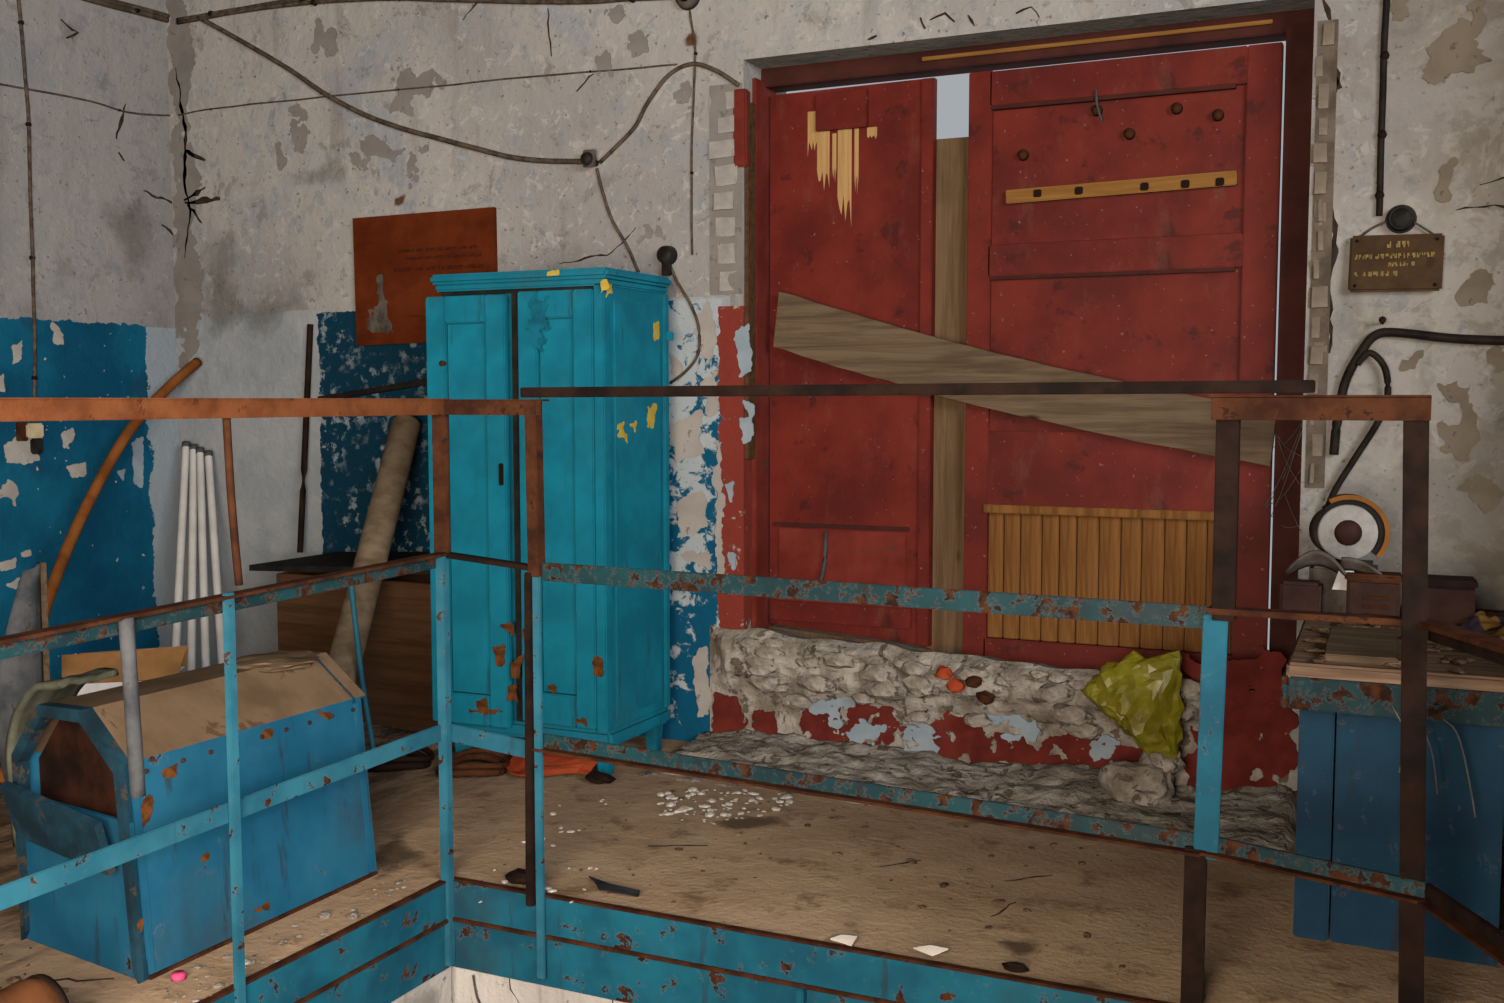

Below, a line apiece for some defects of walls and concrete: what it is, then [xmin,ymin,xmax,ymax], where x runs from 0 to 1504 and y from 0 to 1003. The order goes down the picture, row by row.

flaking render [1419,0,1492,85]
crack [116,73,220,256]
peeling [0,340,23,392]
flaking render [669,80,755,574]
flaking render [1455,269,1494,307]
peeling [0,437,40,506]
peeling [60,421,87,478]
peeling [117,437,144,488]
flaking render [1438,381,1504,514]
peeling [0,550,31,589]
spalling [692,625,1201,806]
peeling [1221,645,1299,800]